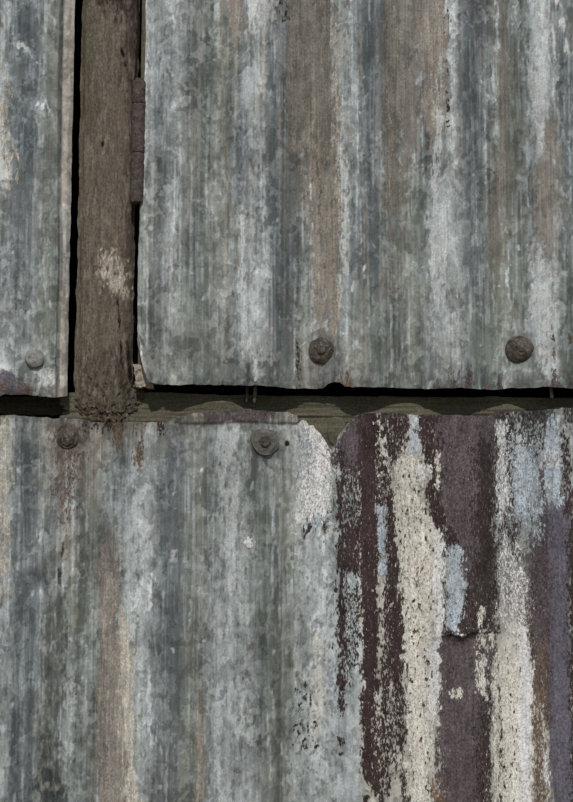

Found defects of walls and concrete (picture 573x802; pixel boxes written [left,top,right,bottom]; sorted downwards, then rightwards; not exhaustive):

rust [43,420,146,531]
rust [292,681,324,750]
peeling [373,415,469,802]
rust [303,408,573,802]
peeling [474,413,566,802]